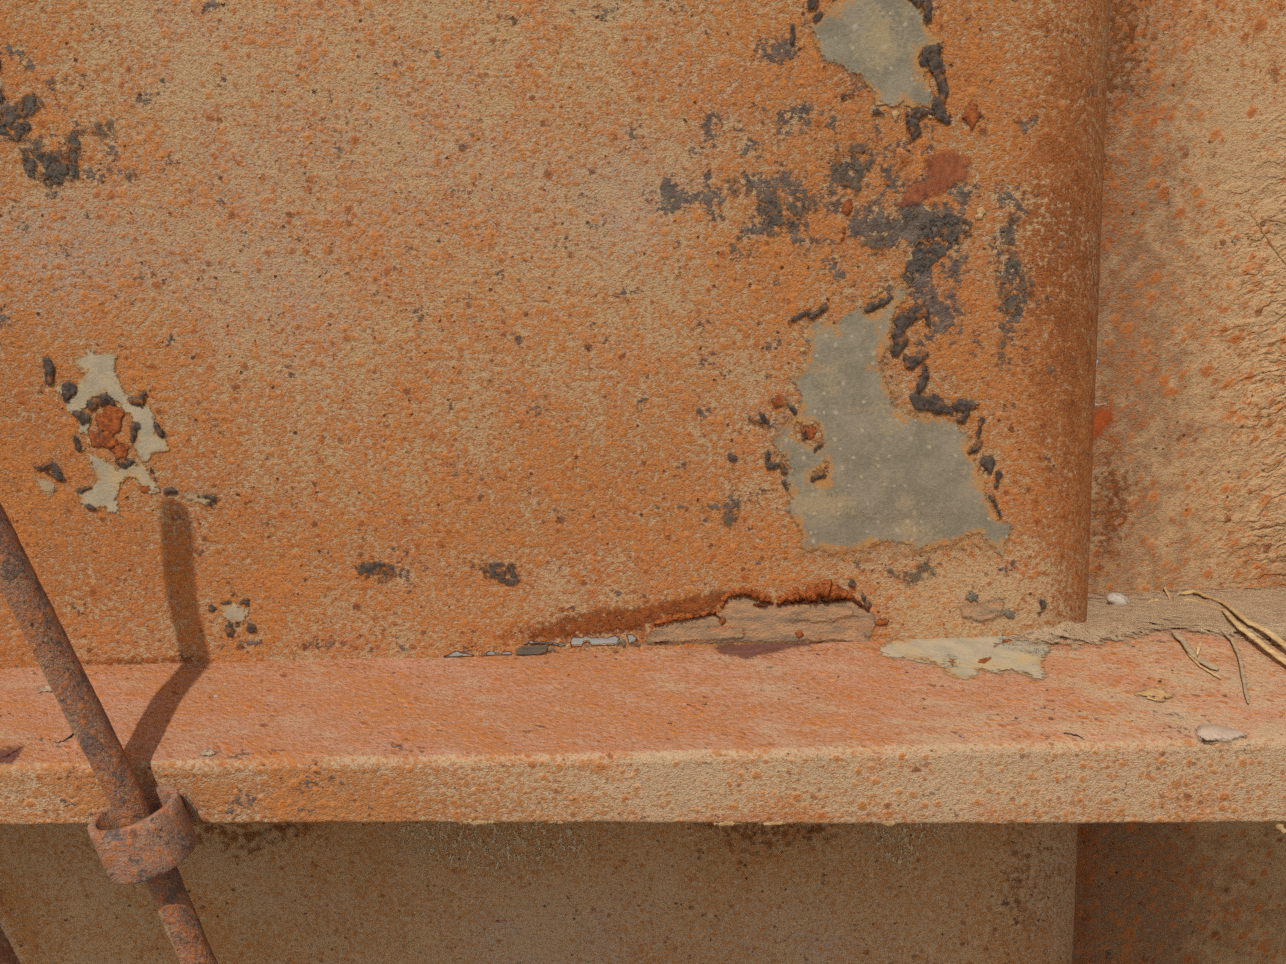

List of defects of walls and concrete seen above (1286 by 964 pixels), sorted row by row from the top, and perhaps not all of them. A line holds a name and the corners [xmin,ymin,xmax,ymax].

peeling [789,0,981,142]
rust [1106,0,1152,113]
peeling [32,348,219,519]
peeling [747,270,1013,560]
rust [1093,461,1139,575]
peeling [208,597,257,637]
rust [527,591,727,640]
spalling [616,578,1052,680]